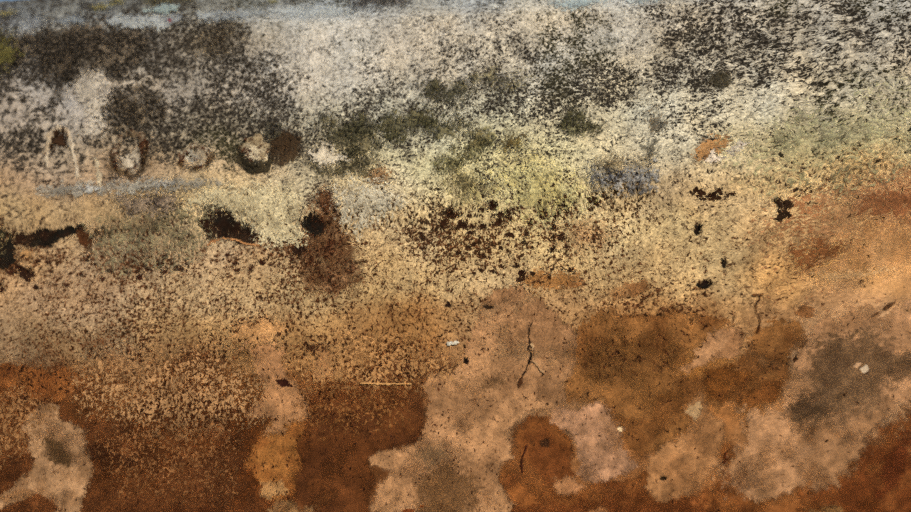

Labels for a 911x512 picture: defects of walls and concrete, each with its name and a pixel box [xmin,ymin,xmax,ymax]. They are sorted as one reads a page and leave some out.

water stain [107,2,186,31]
water stain [68,69,114,141]
water stain [305,140,352,168]
spalling [0,224,105,292]
spalling [197,201,308,271]
rust [297,184,369,300]
water stain [329,177,410,242]
spalling [440,194,610,274]
rust [565,133,911,458]
rust [0,315,449,512]
peeling [0,264,911,512]
rust [499,413,766,512]